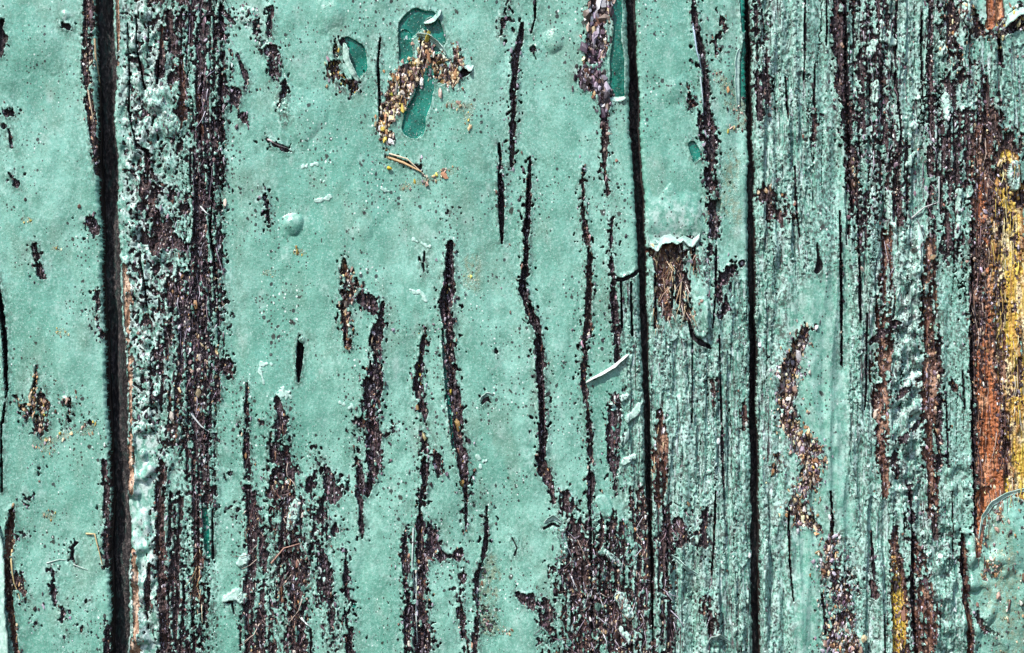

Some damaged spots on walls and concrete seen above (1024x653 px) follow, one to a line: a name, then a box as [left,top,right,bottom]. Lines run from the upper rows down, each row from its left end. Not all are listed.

peeling [0,366,113,653]
peeling [116,0,365,653]
crack [296,207,501,653]
peeling [416,10,446,55]
crack [495,0,770,612]
peeling [510,0,815,653]
peeling [813,0,1024,653]